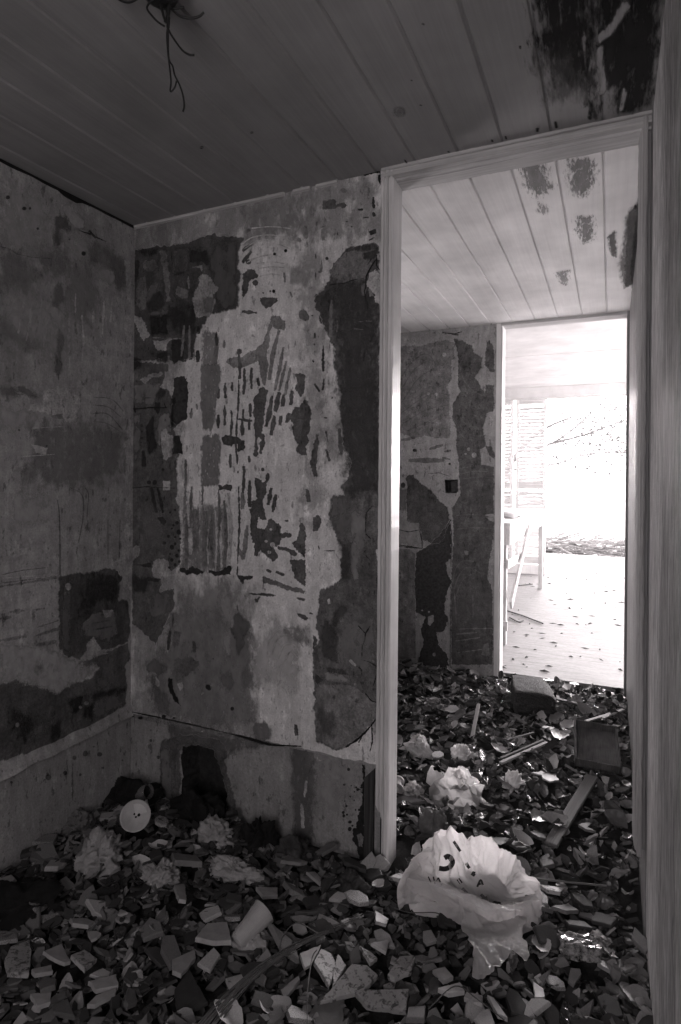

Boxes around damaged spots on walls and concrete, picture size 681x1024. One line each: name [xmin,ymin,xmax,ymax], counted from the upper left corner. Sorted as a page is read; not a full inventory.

damp [532,0,665,119]
damp [620,204,638,287]
peeling [0,188,380,761]
peeling [398,338,495,668]
crack [132,712,302,747]